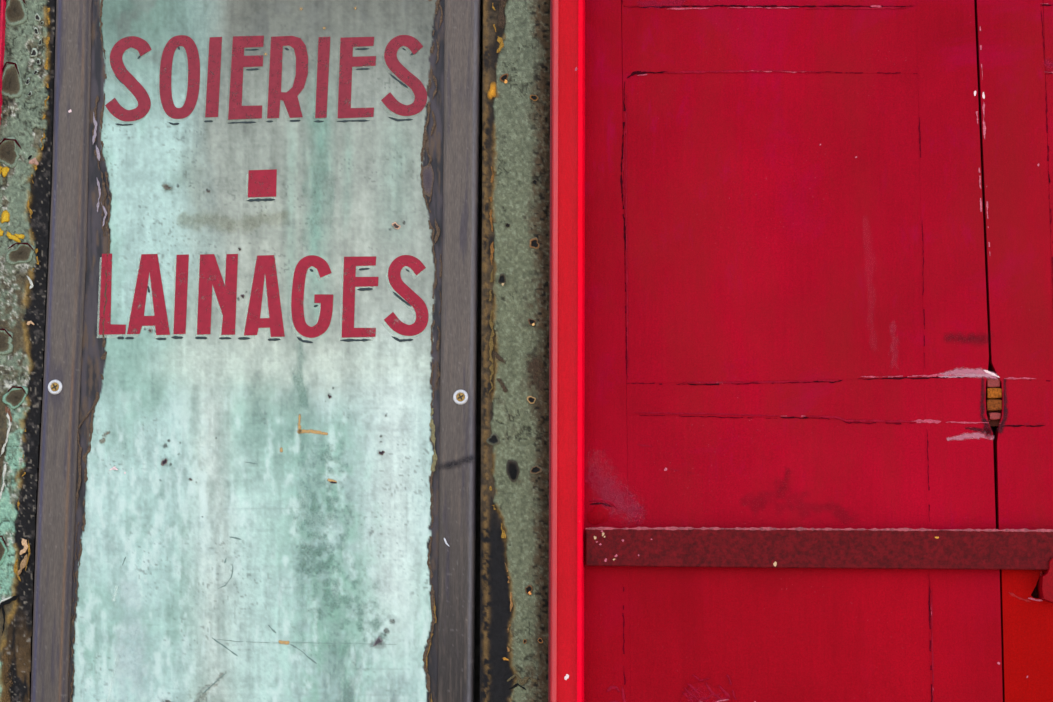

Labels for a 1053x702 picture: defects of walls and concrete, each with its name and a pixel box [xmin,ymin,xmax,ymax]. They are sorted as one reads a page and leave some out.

peeling [92,93,111,256]
corrosion [487,82,497,100]
corrosion [492,0,506,53]
crack [620,69,965,385]
crack [1040,3,1053,280]
peeling [420,0,443,702]
peeling [0,406,12,499]
peeling [0,595,19,634]
peeling [68,392,99,702]
crack [639,412,1044,522]